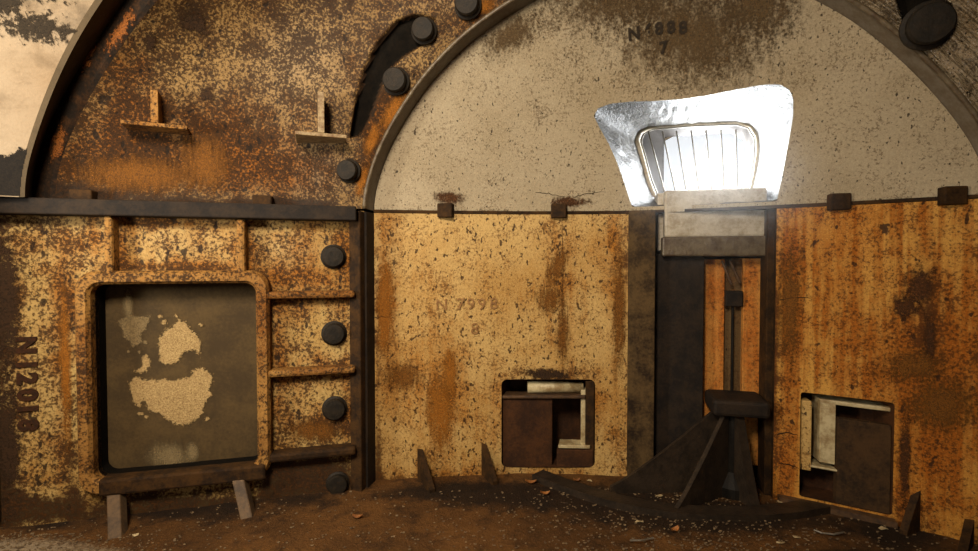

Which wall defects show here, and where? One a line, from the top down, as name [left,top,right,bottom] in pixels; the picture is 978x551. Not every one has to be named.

peeling [80,6,135,73]
rust [74,135,230,193]
rust [364,96,404,154]
rust [434,191,464,203]
rust [0,215,25,507]
peeling [118,314,214,426]
rust [377,257,419,391]
rust [523,368,580,379]
rust [536,249,569,356]
rust [612,253,626,375]
rust [889,264,937,358]
rust [899,416,911,508]